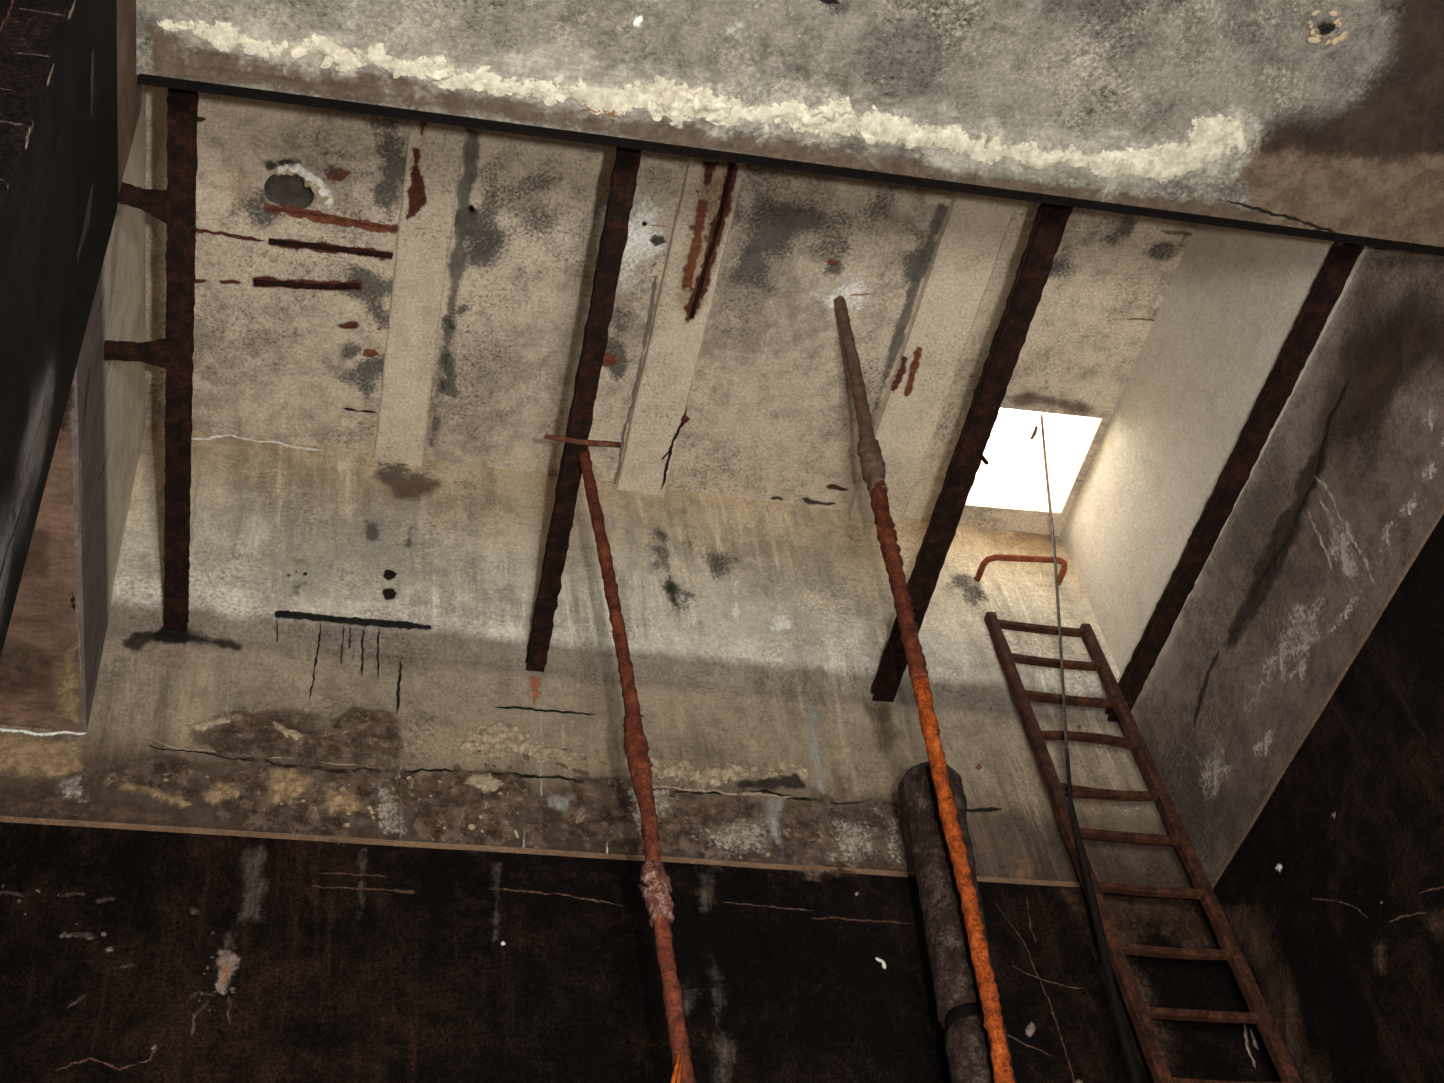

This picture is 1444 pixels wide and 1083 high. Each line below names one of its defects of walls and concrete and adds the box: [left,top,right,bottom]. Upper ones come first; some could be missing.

spalling [1308,10,1348,47]
spalling [196,158,398,260]
corrosion [406,121,427,219]
leakage [146,0,1444,428]
corrosion [891,347,922,396]
leakage [1318,289,1444,449]
crack [1193,378,1350,727]
leakage [1307,475,1376,587]
leakage [1244,598,1324,713]
peeling [103,707,909,881]
leakage [1196,741,1231,799]
peeling [191,932,240,1034]